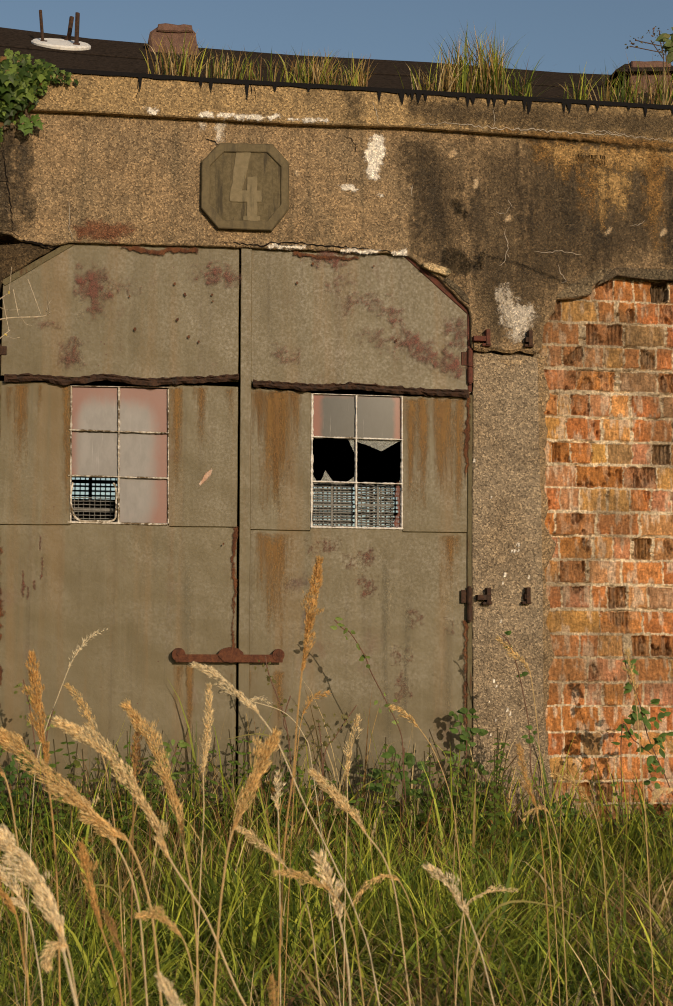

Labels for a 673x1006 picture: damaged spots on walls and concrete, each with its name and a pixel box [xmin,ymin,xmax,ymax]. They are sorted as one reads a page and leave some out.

leakage [405,97,673,343]
spalling [650,281,669,304]
spalling [544,279,636,417]
corrosion [4,373,239,479]
corrosion [253,379,471,486]
spalling [551,441,657,490]
spalling [553,512,596,536]
spalling [632,537,652,560]
spalling [599,610,643,634]